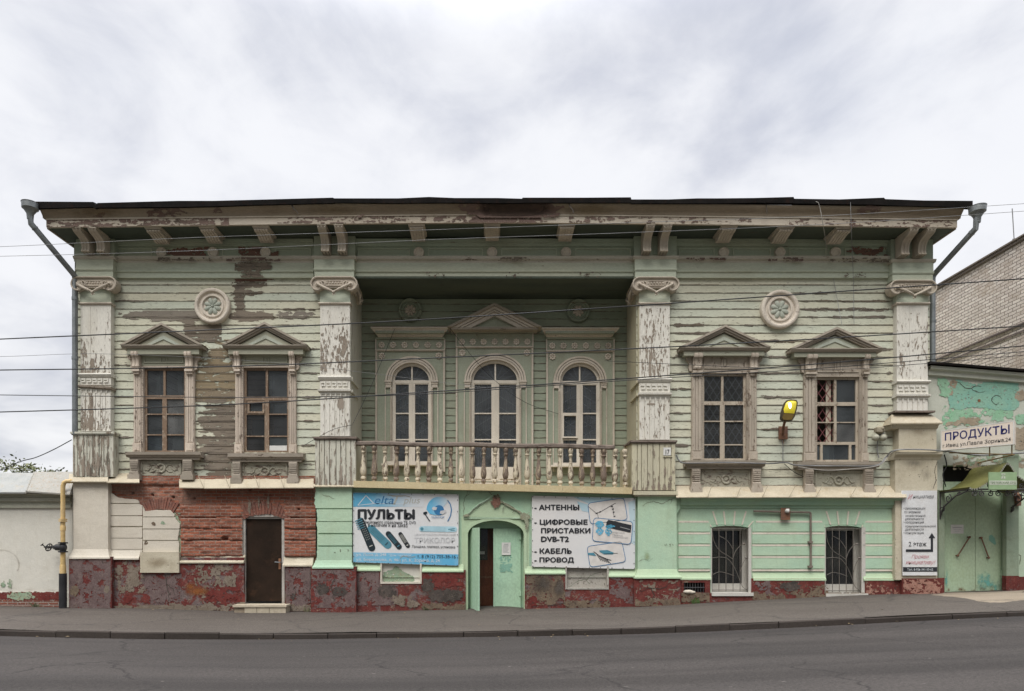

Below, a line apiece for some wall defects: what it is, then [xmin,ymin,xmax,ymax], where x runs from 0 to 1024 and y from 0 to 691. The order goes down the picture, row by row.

peeling [277,203,752,224]
peeling [640,308,709,377]
peeling [799,291,928,383]
flaking render [0,246,466,611]
peeling [632,388,690,490]
peeling [937,378,1024,470]
flaking render [525,574,565,606]
peeling [609,577,681,606]
spalling [752,581,828,600]
peeling [866,579,942,594]